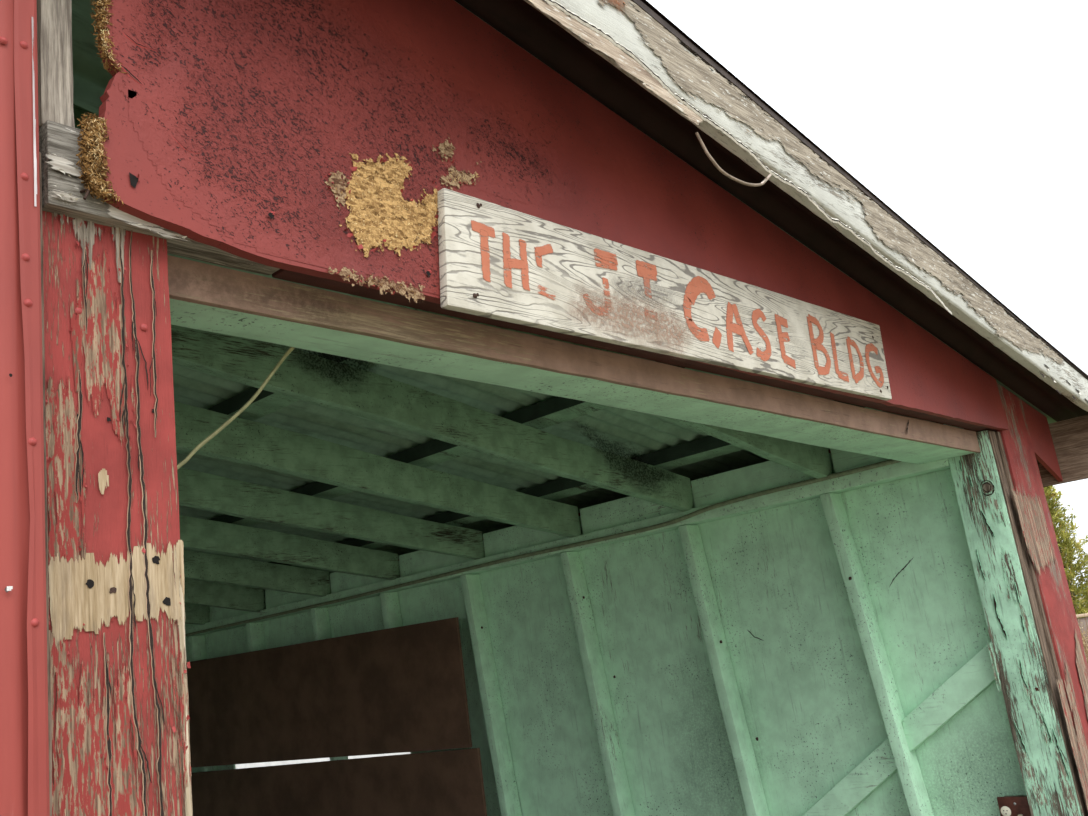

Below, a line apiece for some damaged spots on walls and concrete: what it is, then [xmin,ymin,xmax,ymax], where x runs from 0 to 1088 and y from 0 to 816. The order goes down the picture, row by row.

spalling [324,137,481,260]
peeling [529,0,1088,402]
crack [81,247,89,334]
spalling [328,267,425,303]
crack [75,370,84,503]
peeling [32,17,192,816]
crack [103,227,165,816]
peeling [978,457,1056,575]
peeling [1001,547,1043,665]
peeling [1015,658,1088,816]